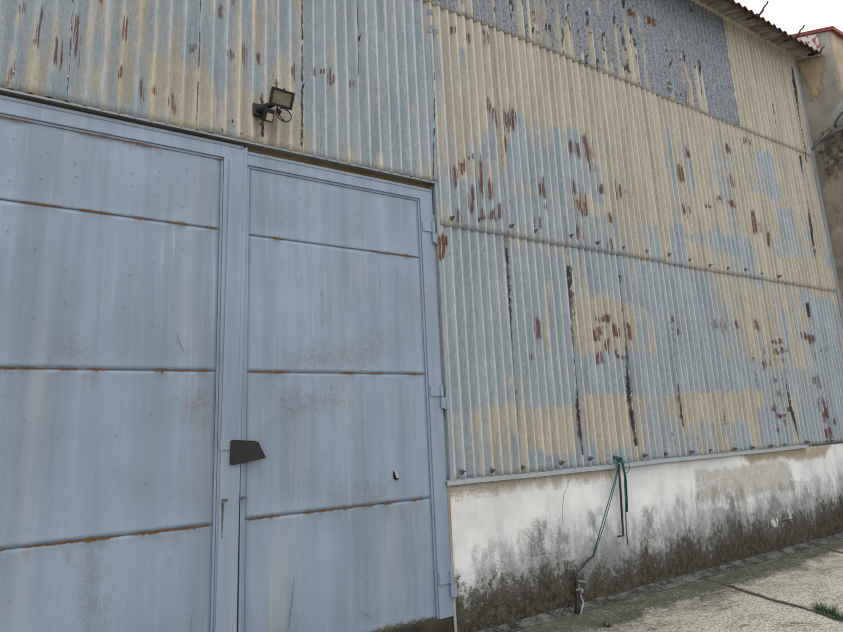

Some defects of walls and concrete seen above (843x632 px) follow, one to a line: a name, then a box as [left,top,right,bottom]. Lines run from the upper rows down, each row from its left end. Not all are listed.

peeling [487,99,518,151]
leakage [814,126,843,180]
corrosion [438,232,448,260]
corrosion [0,334,113,372]
corrosion [249,333,384,424]
leakage [450,469,611,496]
corrosion [23,536,120,548]
corrosion [131,525,211,536]
leakage [454,486,843,632]